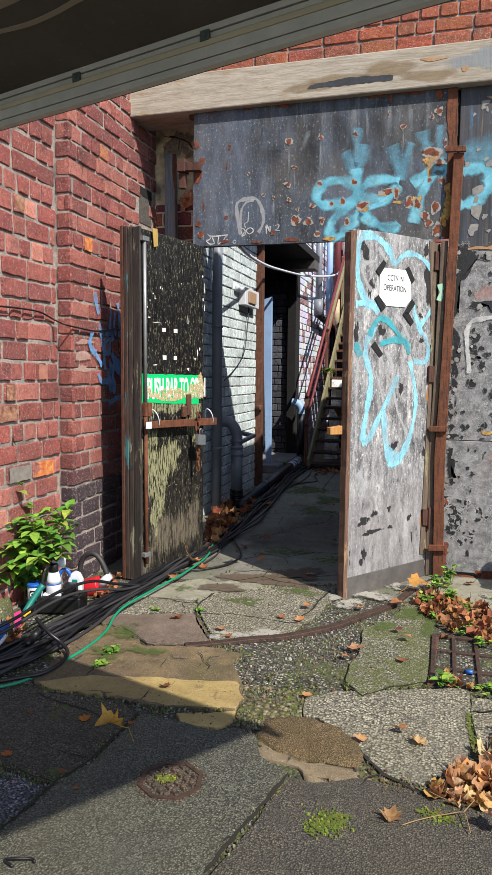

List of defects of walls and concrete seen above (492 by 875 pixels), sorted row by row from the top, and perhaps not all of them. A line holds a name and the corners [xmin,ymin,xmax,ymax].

corrosion [284,182,335,241]
corrosion [329,88,459,239]
peeling [445,185,492,486]
peeling [444,512,483,557]